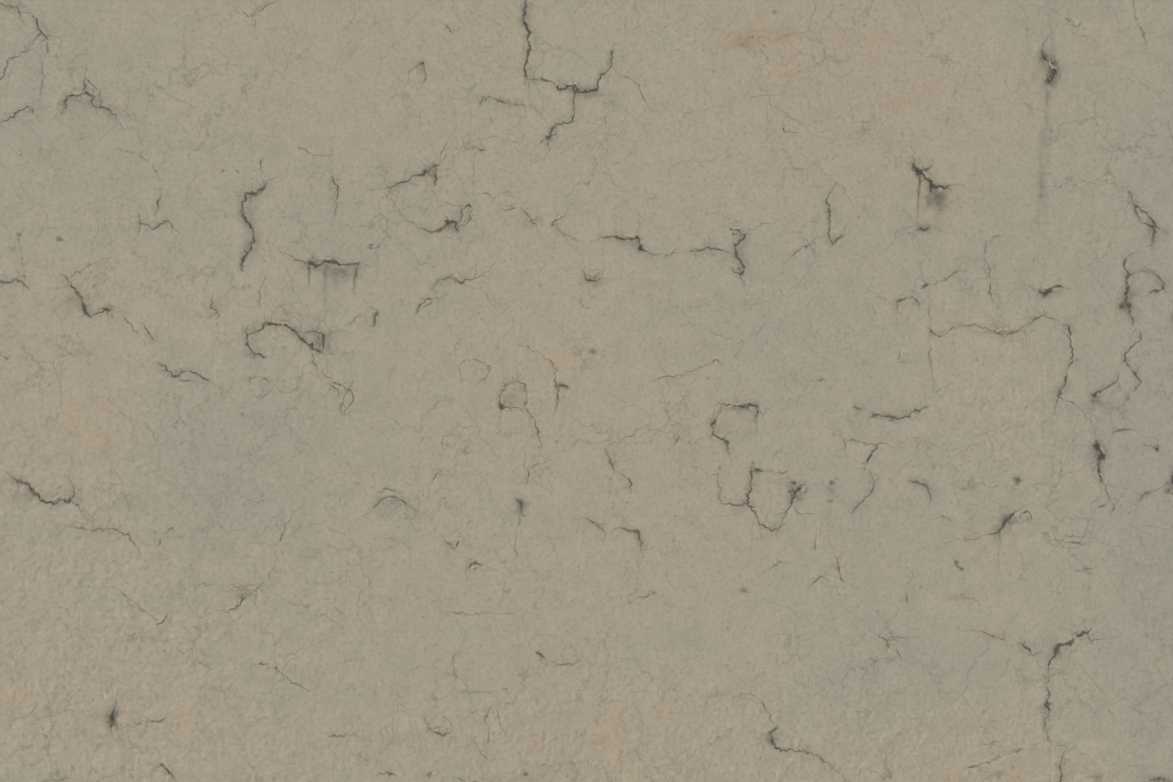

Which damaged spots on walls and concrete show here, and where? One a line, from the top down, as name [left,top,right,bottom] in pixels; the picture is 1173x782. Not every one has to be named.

crack [523,1,613,139]
crack [66,271,109,317]
crack [241,163,264,266]
crack [309,256,357,268]
crack [609,233,644,251]
crack [700,224,746,275]
crack [1123,258,1164,313]
crack [245,320,324,358]
crack [1058,326,1105,403]
crack [17,480,75,505]
crack [711,400,806,531]
crack [1025,630,1090,720]